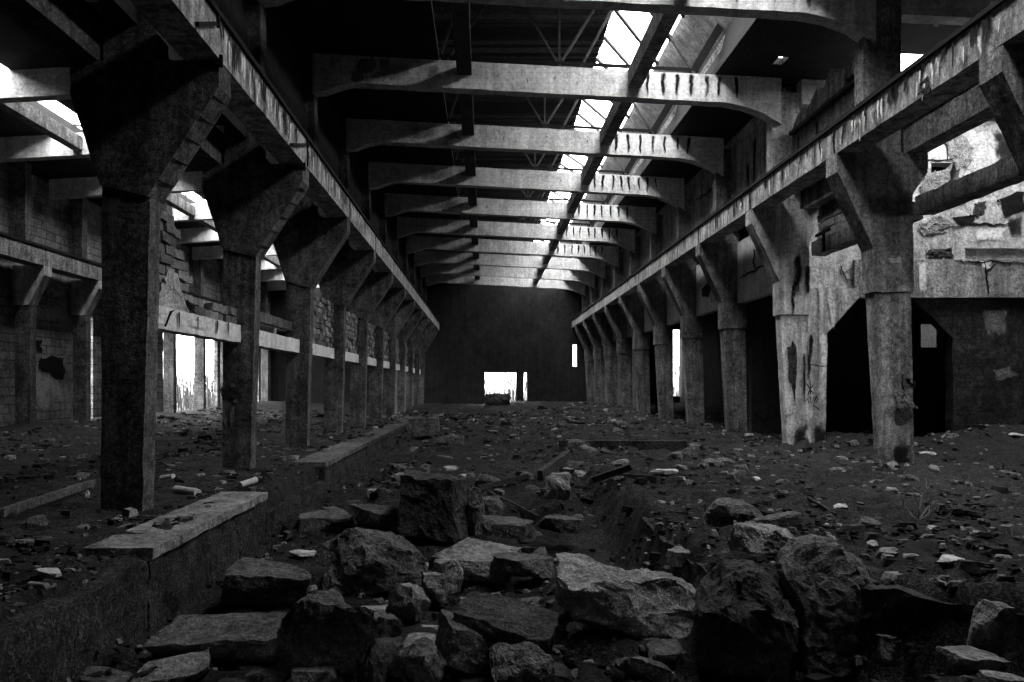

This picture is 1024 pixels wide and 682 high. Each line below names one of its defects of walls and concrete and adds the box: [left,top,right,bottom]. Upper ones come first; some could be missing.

damp [646,73,739,97]
peeling [919,191,1024,259]
crack [740,249,765,279]
damp [791,255,834,403]
spalling [36,340,66,380]